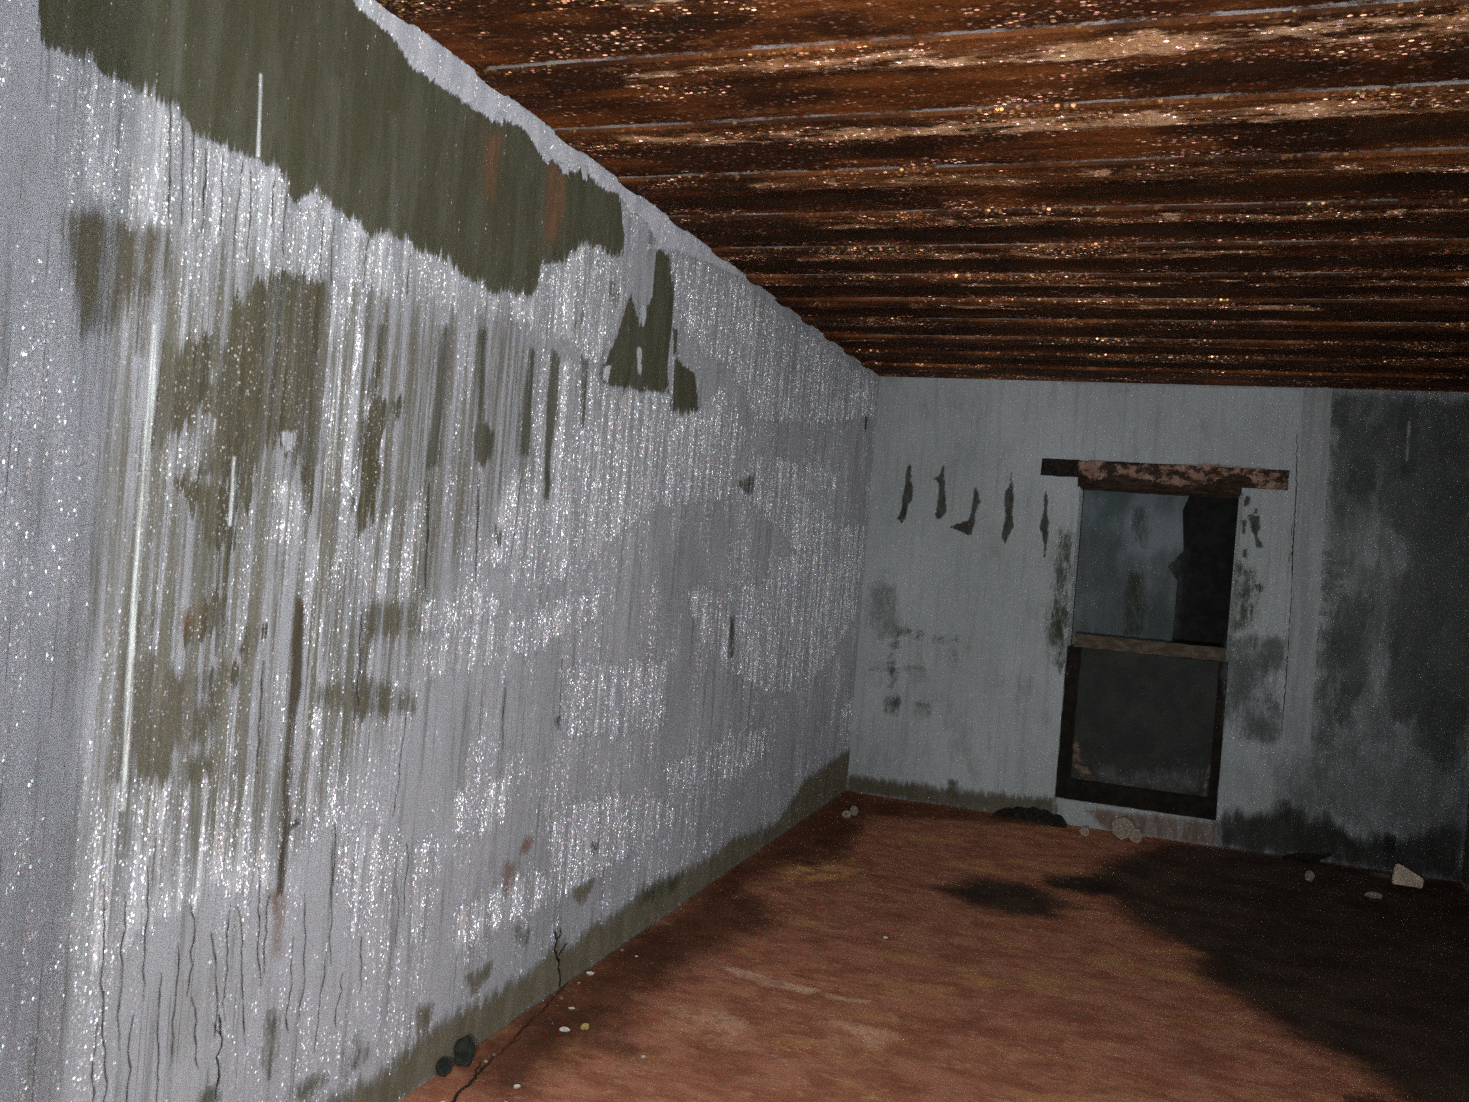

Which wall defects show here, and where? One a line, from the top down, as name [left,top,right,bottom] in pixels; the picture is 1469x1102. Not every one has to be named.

peeling [38,0,625,298]
peeling [618,100,1459,145]
peeling [621,13,1469,88]
peeling [599,249,698,417]
damp [1062,381,1301,389]
damp [40,0,876,979]
peeling [934,466,980,535]
peeling [1002,478,1014,543]
damp [268,1017,276,1075]
crack [451,928,575,1102]
damp [331,699,1058,1102]
damp [941,801,1469,1102]